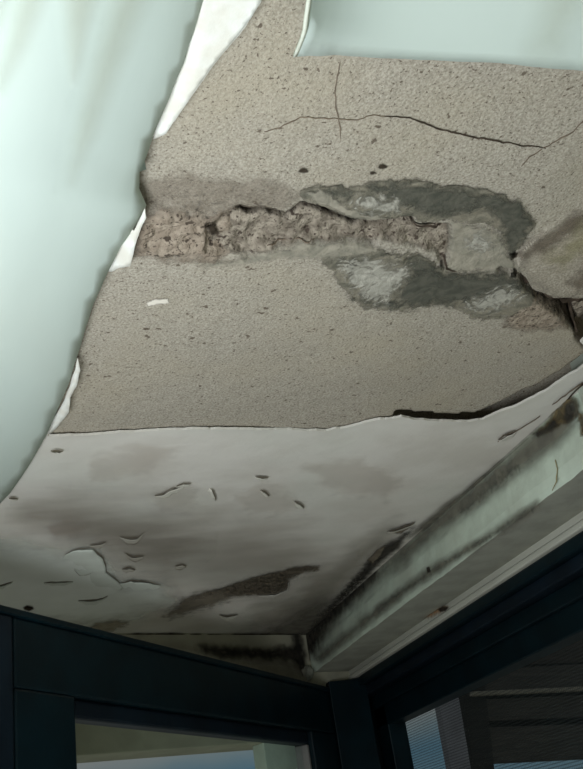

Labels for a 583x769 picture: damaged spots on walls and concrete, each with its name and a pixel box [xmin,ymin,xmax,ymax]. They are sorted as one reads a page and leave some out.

crack [264,63,583,167]
spalling [0,0,583,503]
damp [339,257,524,311]
damp [307,182,583,257]
peeling [62,533,161,605]
peeling [168,566,319,617]
damp [200,398,583,676]